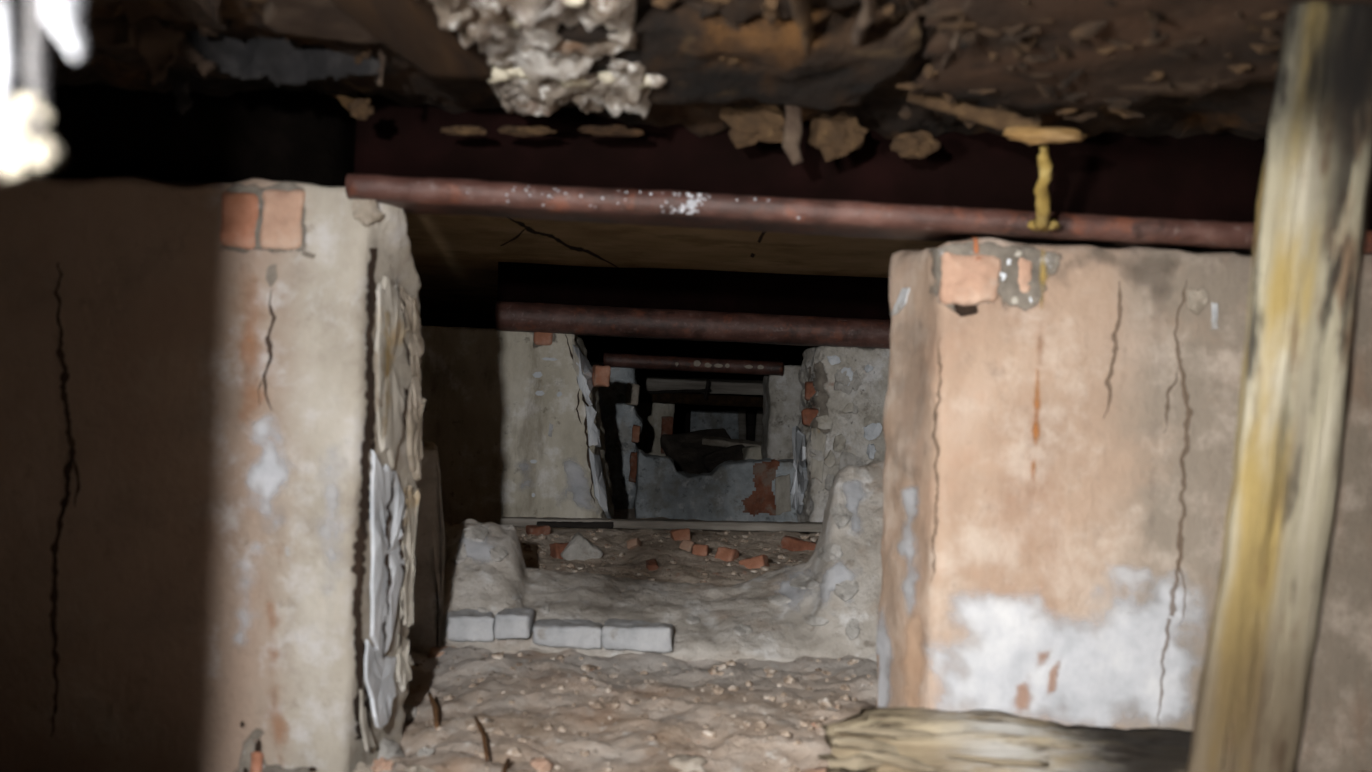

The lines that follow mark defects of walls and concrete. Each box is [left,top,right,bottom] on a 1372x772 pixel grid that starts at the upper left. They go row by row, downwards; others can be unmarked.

flaking render [219,182,316,287]
flaking render [930,240,1061,317]
crack [258,290,276,411]
crack [1103,281,1122,419]
crack [49,263,80,737]
peeling [359,276,426,751]
damp [448,527,508,564]
damp [768,481,864,641]
damp [876,488,1201,727]
crack [1157,281,1192,726]
flaking render [237,721,316,772]